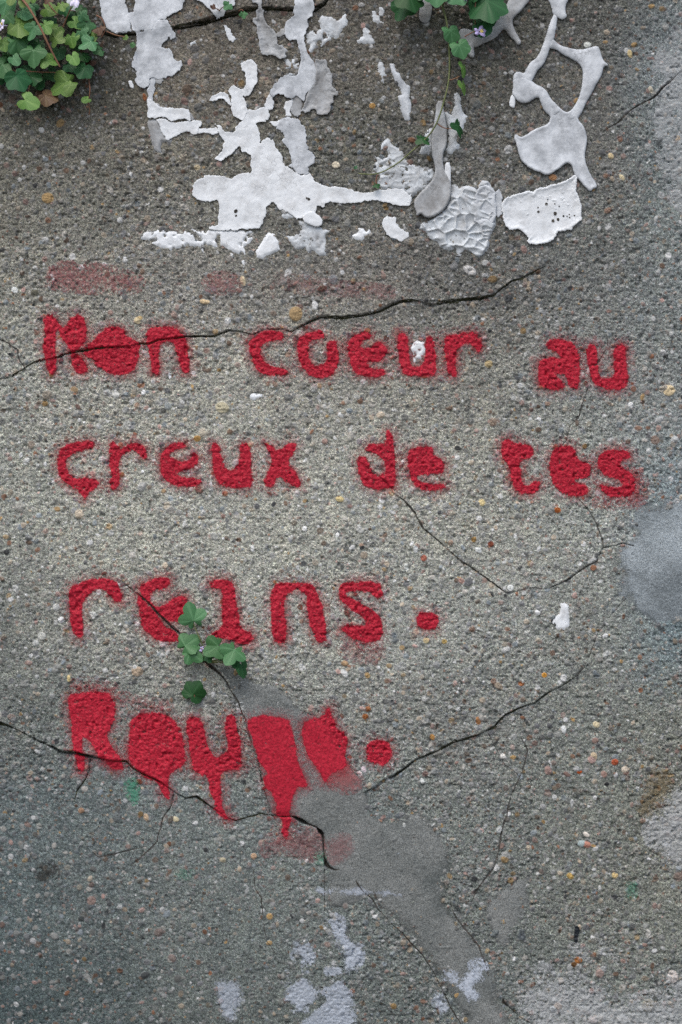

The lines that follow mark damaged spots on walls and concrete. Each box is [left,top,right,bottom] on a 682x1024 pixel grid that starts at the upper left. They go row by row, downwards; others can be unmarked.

peeling [100,0,608,267]
crack [607,70,682,129]
crack [0,265,547,379]
crack [399,320,634,593]
crack [129,587,180,634]
crack [0,661,461,1024]
crack [367,599,626,976]